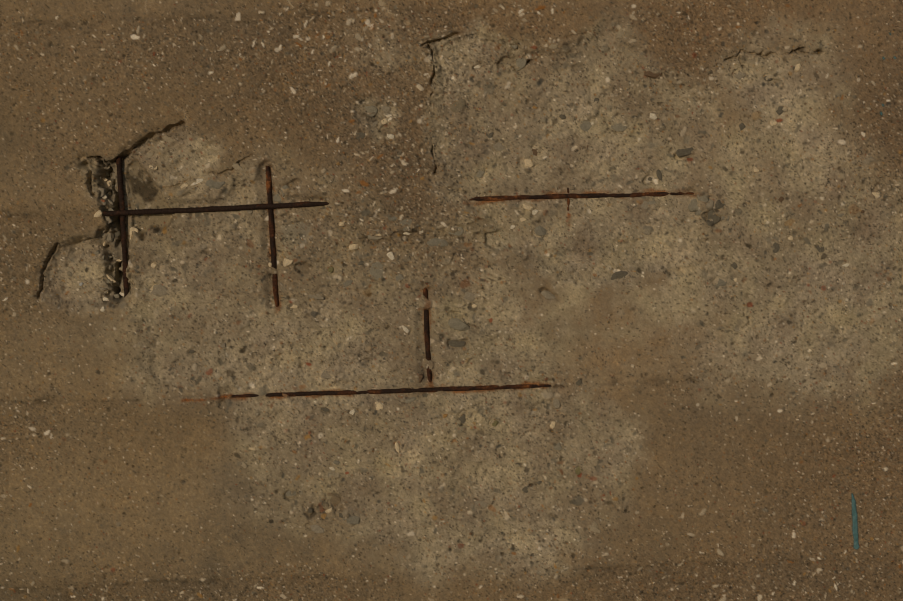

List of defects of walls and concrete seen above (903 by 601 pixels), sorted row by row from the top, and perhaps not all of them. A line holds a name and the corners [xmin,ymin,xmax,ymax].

spalling [41,123,646,583]
spalling [352,97,402,143]
crack [420,31,462,184]
spalling [425,18,903,411]